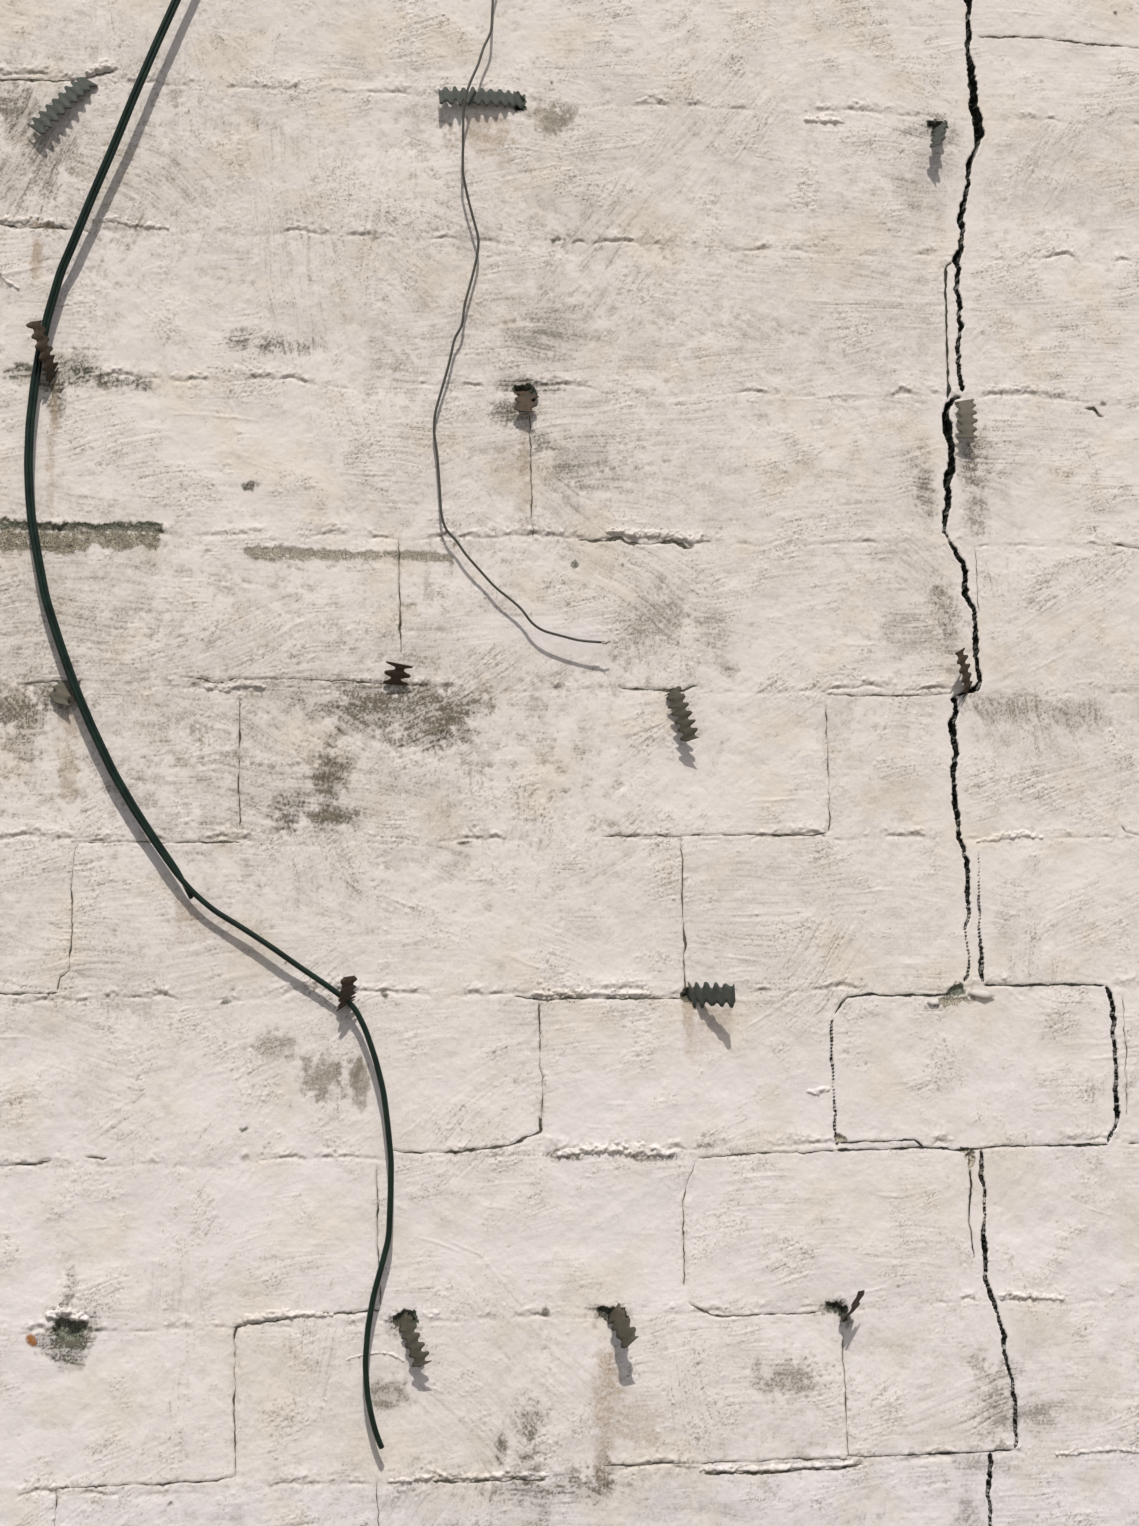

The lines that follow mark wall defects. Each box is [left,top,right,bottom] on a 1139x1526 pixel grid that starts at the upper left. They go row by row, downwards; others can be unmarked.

leakage [271,681,494,831]
crack [324,0,1139,1526]